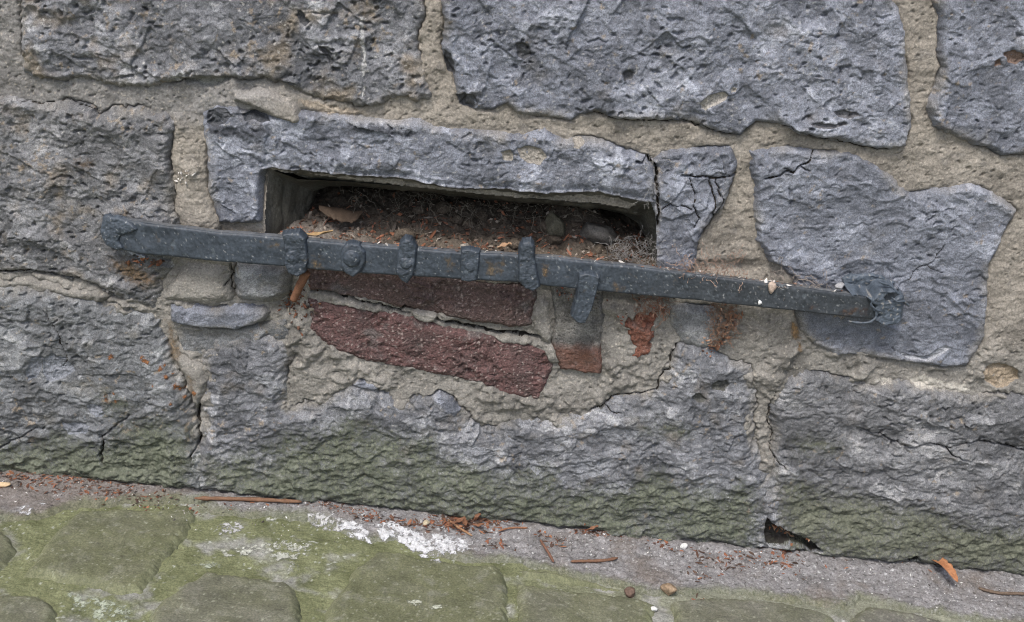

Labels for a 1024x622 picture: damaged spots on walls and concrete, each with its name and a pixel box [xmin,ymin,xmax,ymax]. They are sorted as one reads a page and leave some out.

crack [594,111,749,134]
crack [768,125,888,178]
crack [647,155,730,228]
crack [593,343,676,414]
crack [190,403,202,457]
damp [202,541,311,569]
damp [308,513,471,561]
spalling [764,518,820,551]
damp [68,593,131,622]